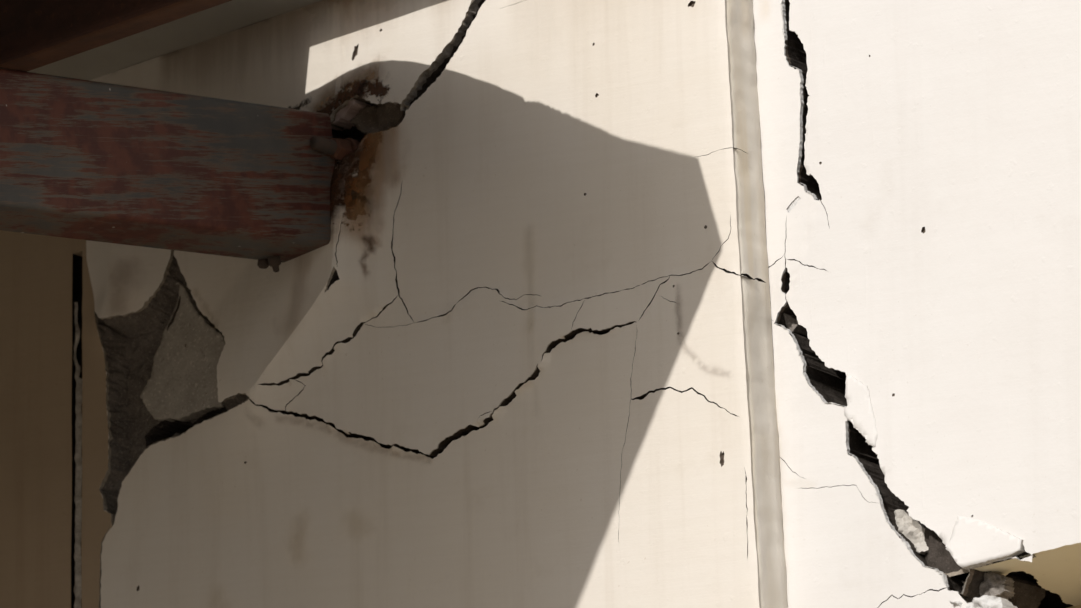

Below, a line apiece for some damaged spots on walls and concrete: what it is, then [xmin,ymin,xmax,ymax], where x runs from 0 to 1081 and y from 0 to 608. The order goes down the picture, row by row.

rust [289,69,390,116]
flaking render [330,95,410,143]
crack [400,0,526,111]
crack [780,0,829,225]
rust [330,131,384,231]
flaking render [94,250,250,526]
crack [145,183,1045,608]
spalling [924,525,1017,608]